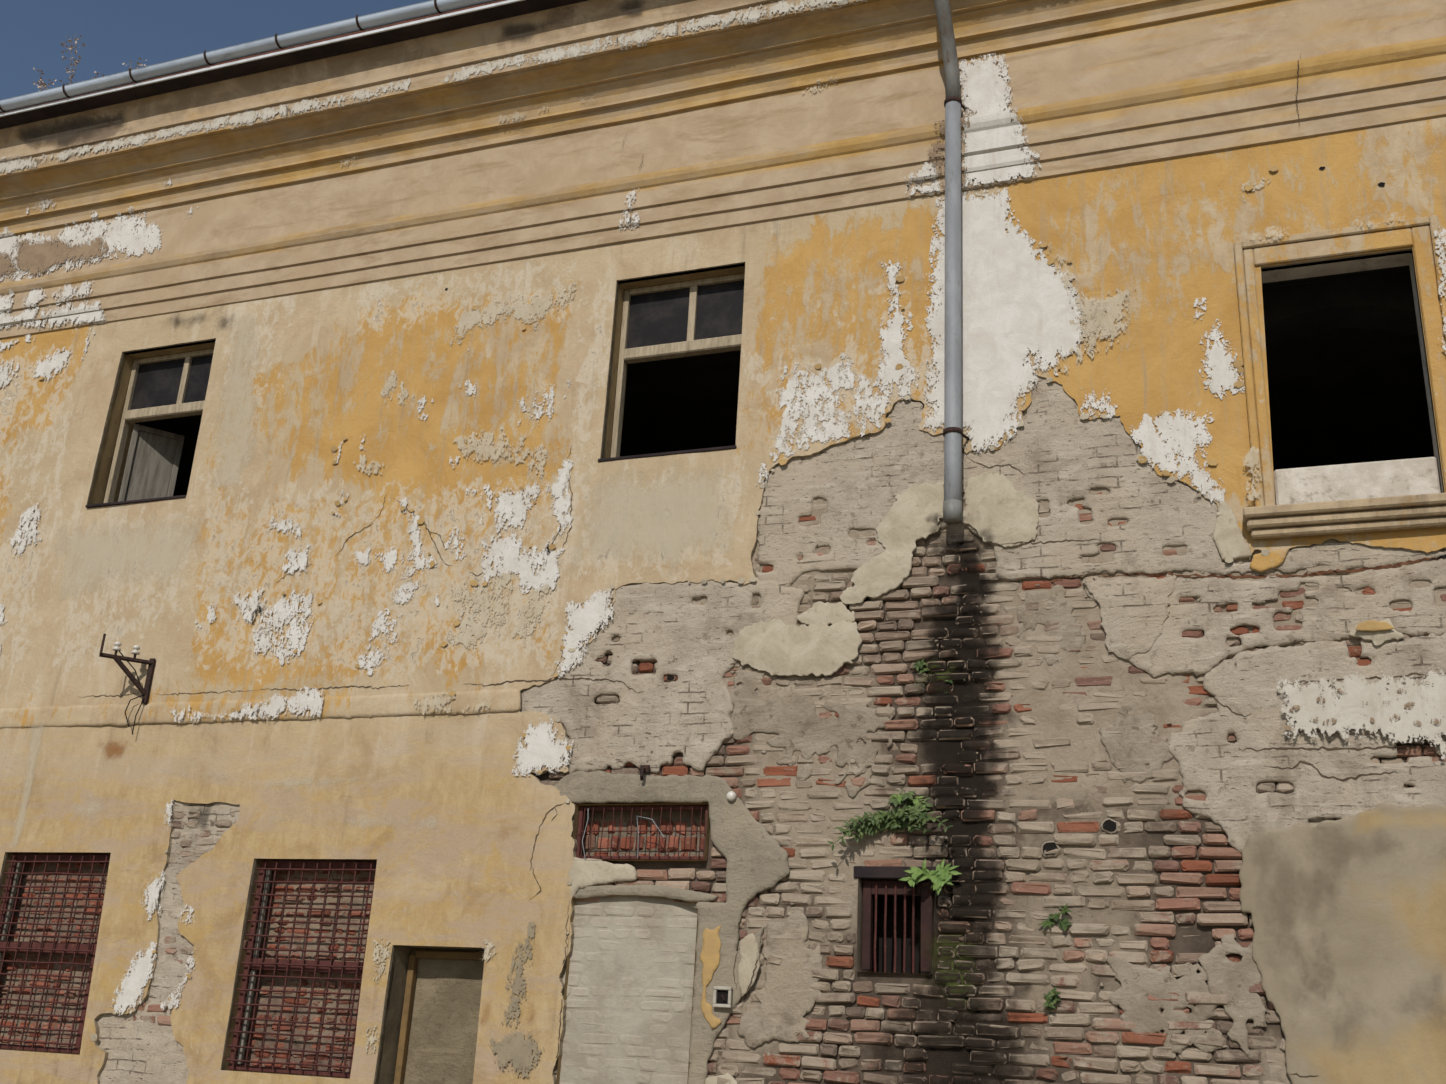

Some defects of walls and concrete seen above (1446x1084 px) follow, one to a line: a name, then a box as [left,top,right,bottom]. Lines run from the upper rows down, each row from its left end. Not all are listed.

damp [21,117,122,143]
peeling [0,206,164,394]
peeling [364,370,434,420]
peeling [449,282,577,350]
peeling [10,503,47,555]
peeling [233,516,322,665]
peeling [351,379,573,675]
flaking render [511,53,1446,1084]
damp [878,538,1020,1084]
flaking render [90,799,240,1084]
peeling [489,921,545,1078]
crack [530,802,570,1079]